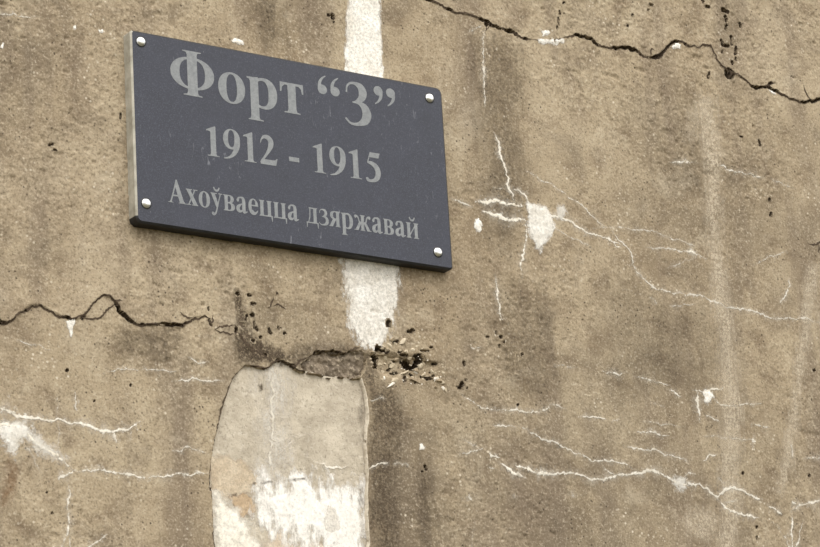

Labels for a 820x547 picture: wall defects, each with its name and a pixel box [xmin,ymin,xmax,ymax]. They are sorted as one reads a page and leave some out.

crack [425,0,820,104]
efflorescence [527,203,565,249]
crack [0,294,360,441]
spalling [301,328,447,392]